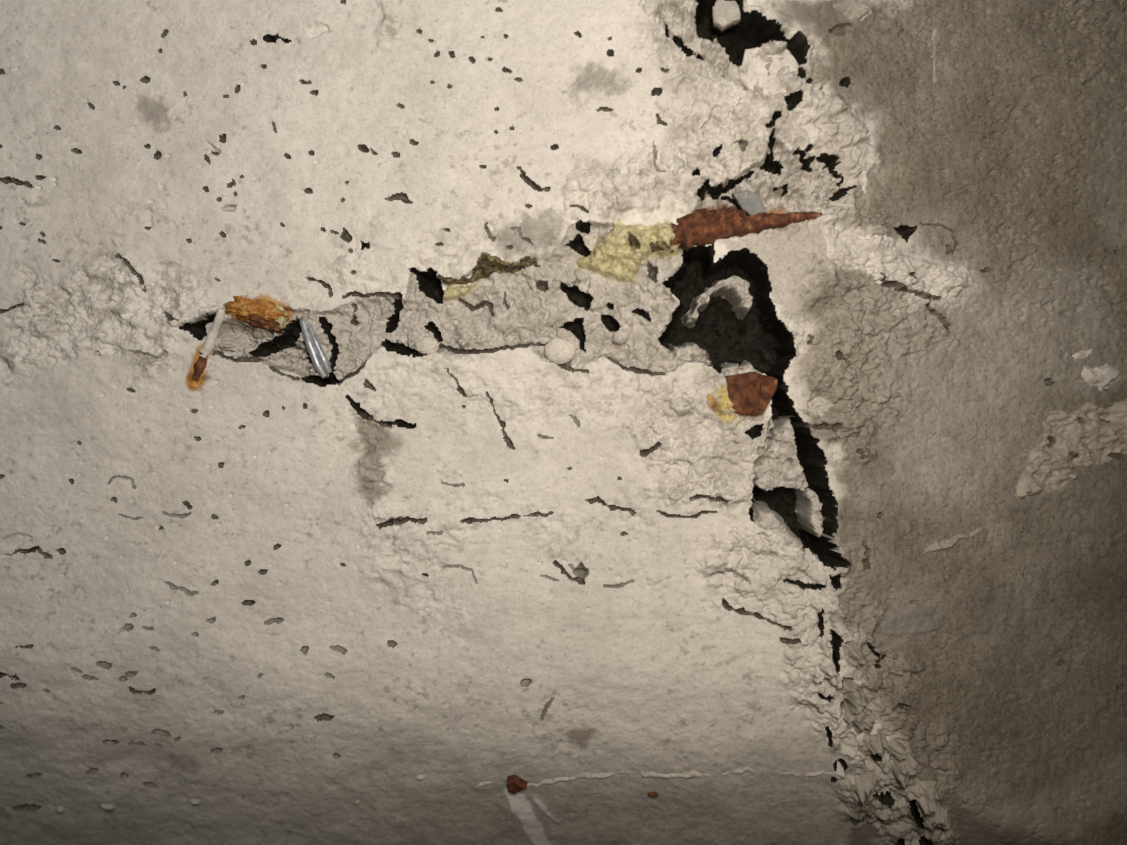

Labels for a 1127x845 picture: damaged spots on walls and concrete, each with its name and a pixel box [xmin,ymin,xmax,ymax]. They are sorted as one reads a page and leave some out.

crack [805,77,851,88]
crack [652,113,668,172]
peeling [220,203,238,212]
crack [516,166,589,214]
corrosion [670,204,823,254]
corrosion [249,296,293,334]
corrosion [186,346,205,390]
spalling [177,219,871,571]
corrosion [707,372,778,421]
crack [640,442,662,457]